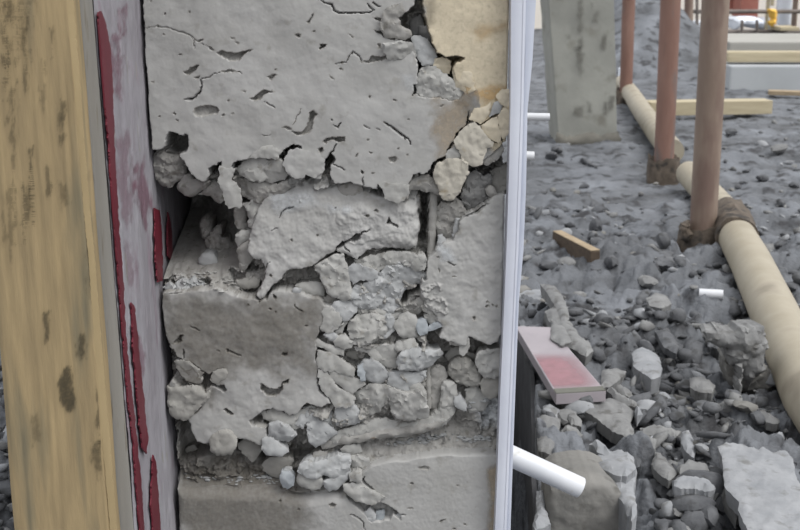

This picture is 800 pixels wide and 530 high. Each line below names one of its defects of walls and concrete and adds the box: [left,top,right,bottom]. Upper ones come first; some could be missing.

spalling [192,104,220,118]
spalling [153,109,378,334]
spalling [360,0,475,108]
spalling [378,89,509,252]
damp [423,0,509,149]
spalling [167,337,500,522]